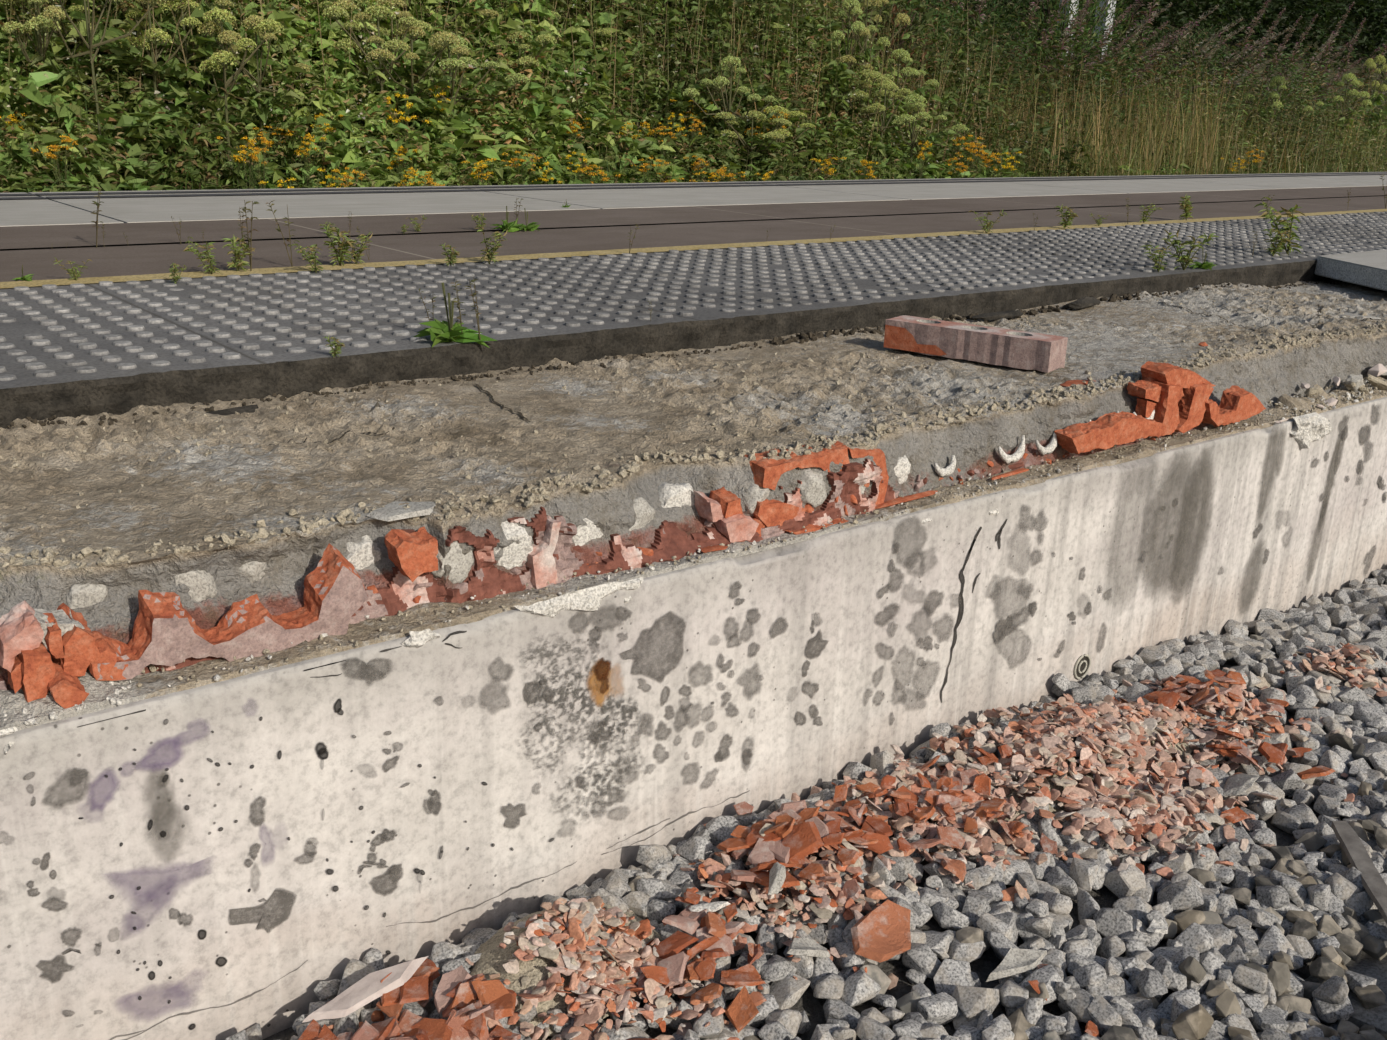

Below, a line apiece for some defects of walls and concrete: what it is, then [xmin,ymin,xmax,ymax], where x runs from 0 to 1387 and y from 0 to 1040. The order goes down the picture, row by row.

leakage [1140,451,1212,598]
rust [589,658,611,705]
crack [940,519,1007,703]